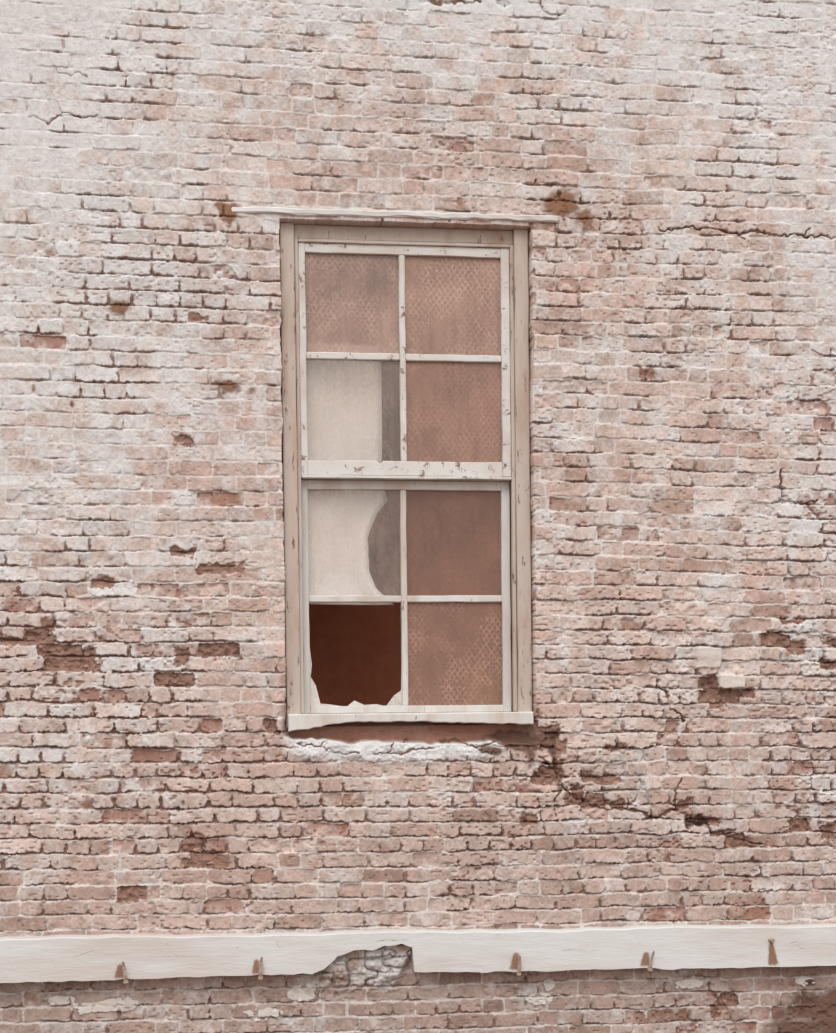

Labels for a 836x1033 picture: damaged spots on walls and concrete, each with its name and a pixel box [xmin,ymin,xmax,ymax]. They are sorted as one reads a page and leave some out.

crack [429,0,505,8]
rust [545,192,594,230]
spalling [760,617,805,655]
spalling [819,637,836,670]
spalling [698,675,755,710]
crack [539,757,682,820]